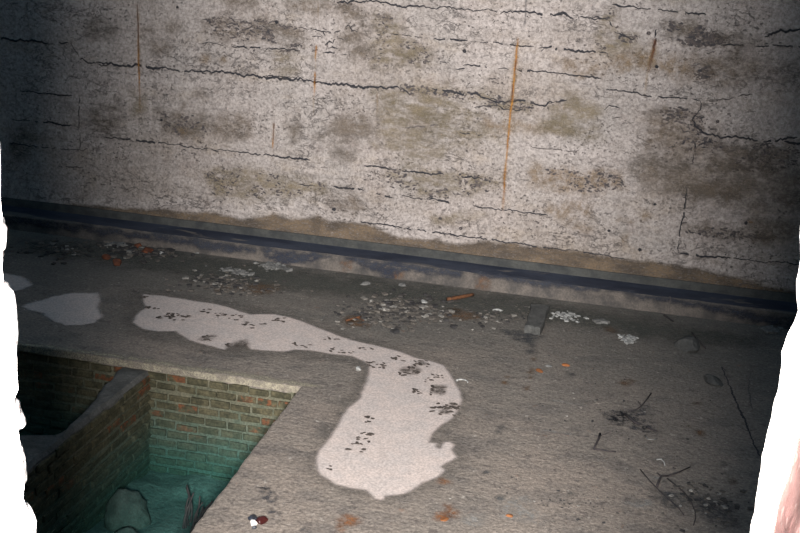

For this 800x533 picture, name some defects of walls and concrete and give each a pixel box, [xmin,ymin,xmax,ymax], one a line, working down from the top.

crack [337,0,706,40]
crack [1,37,410,95]
corrosion [504,46,518,192]
crack [102,134,314,187]
damp [3,216,541,314]
crack [333,184,450,204]
crack [364,162,481,179]
damp [73,205,799,294]
crack [473,202,546,219]
damp [637,157,800,207]
crack [677,186,800,265]
damp [546,308,749,344]